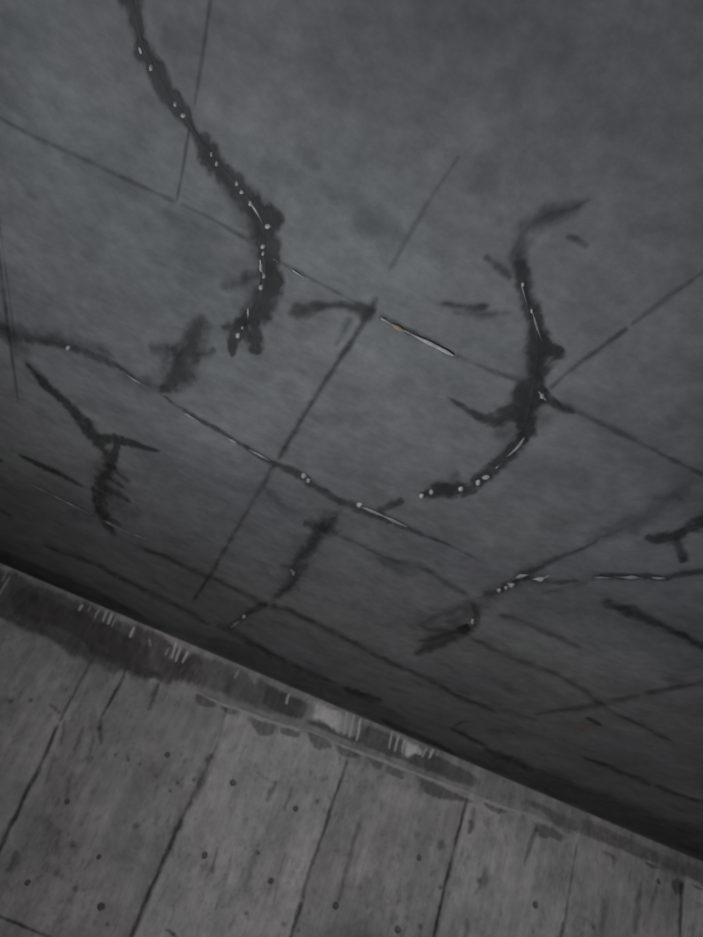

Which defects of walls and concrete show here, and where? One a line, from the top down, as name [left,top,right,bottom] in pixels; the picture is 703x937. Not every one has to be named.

crack [119,0,305,356]
crack [0,365,159,532]
crack [164,253,574,595]
crack [594,516,703,581]
water stain [0,571,190,681]
water stain [606,601,703,649]
water stain [313,703,361,741]
water stain [384,722,455,758]